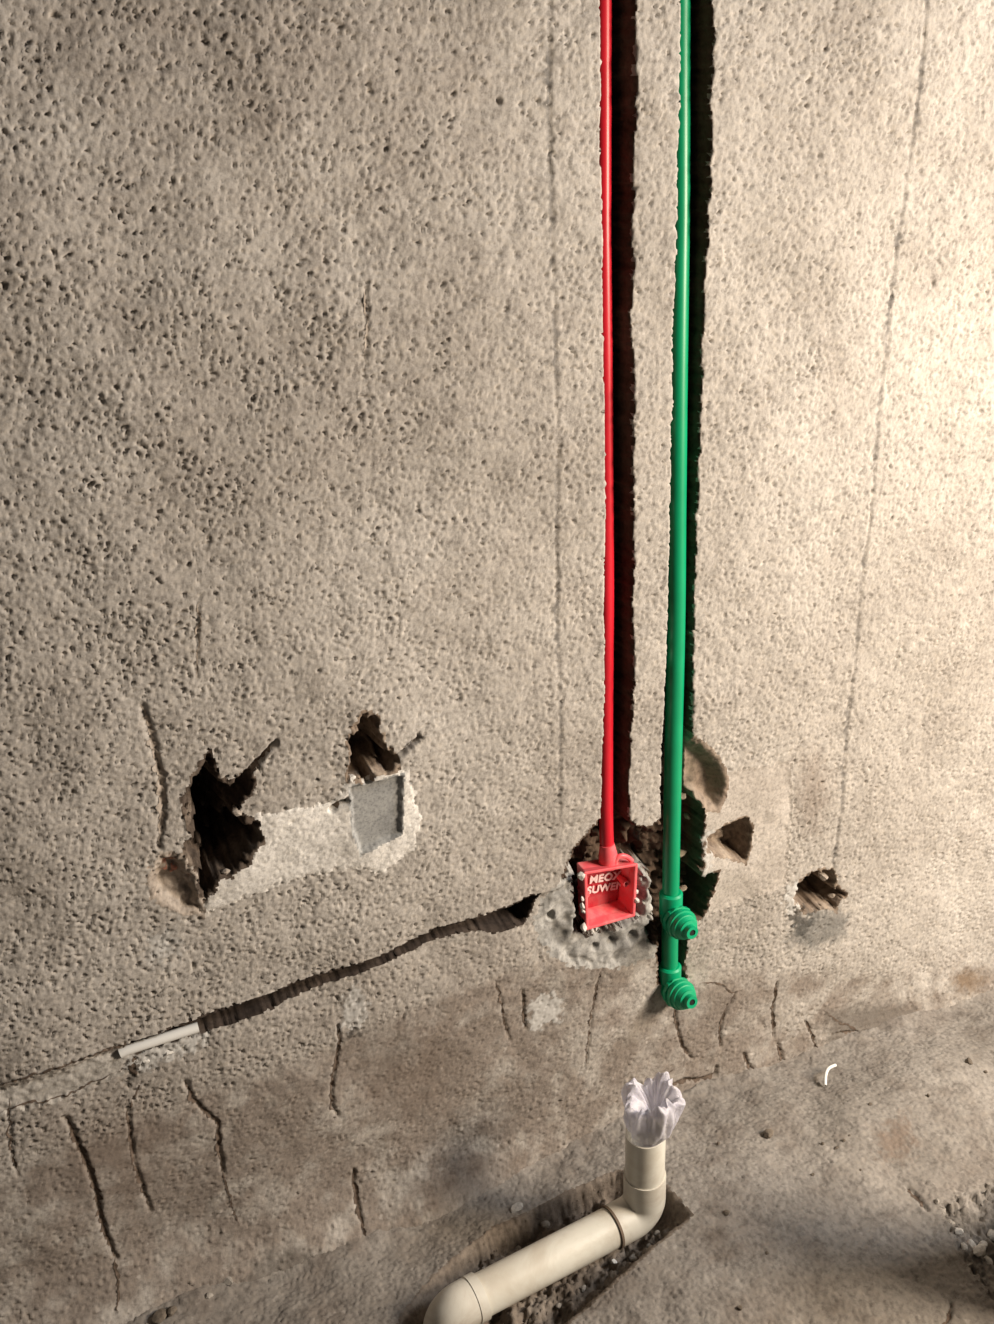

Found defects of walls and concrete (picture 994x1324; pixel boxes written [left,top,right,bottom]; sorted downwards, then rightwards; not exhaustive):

spalling [146,744,270,919]
crack [0,893,541,1312]
spalling [345,710,417,785]
spalling [561,715,665,985]
spalling [678,939,690,979]
spalling [679,725,754,921]
crack [668,982,858,1085]
spalling [793,867,848,915]